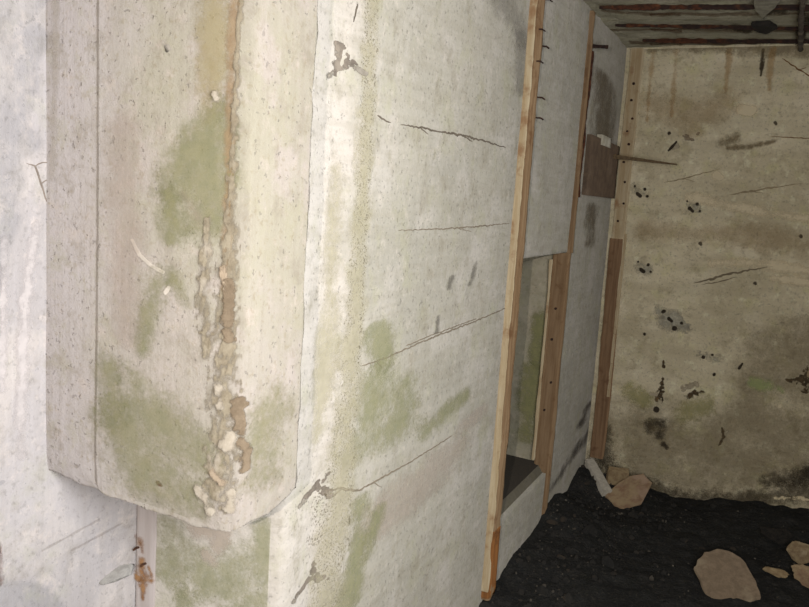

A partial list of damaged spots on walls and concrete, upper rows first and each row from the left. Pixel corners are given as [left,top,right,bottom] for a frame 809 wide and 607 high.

spalling [583,0,809,52]
crack [377,115,506,148]
damp [721,136,775,150]
crack [27,162,47,202]
spalling [193,0,253,517]
crack [695,266,772,285]
crack [362,308,505,368]
damp [644,419,669,450]
crack [325,435,453,496]
rust [135,558,153,600]